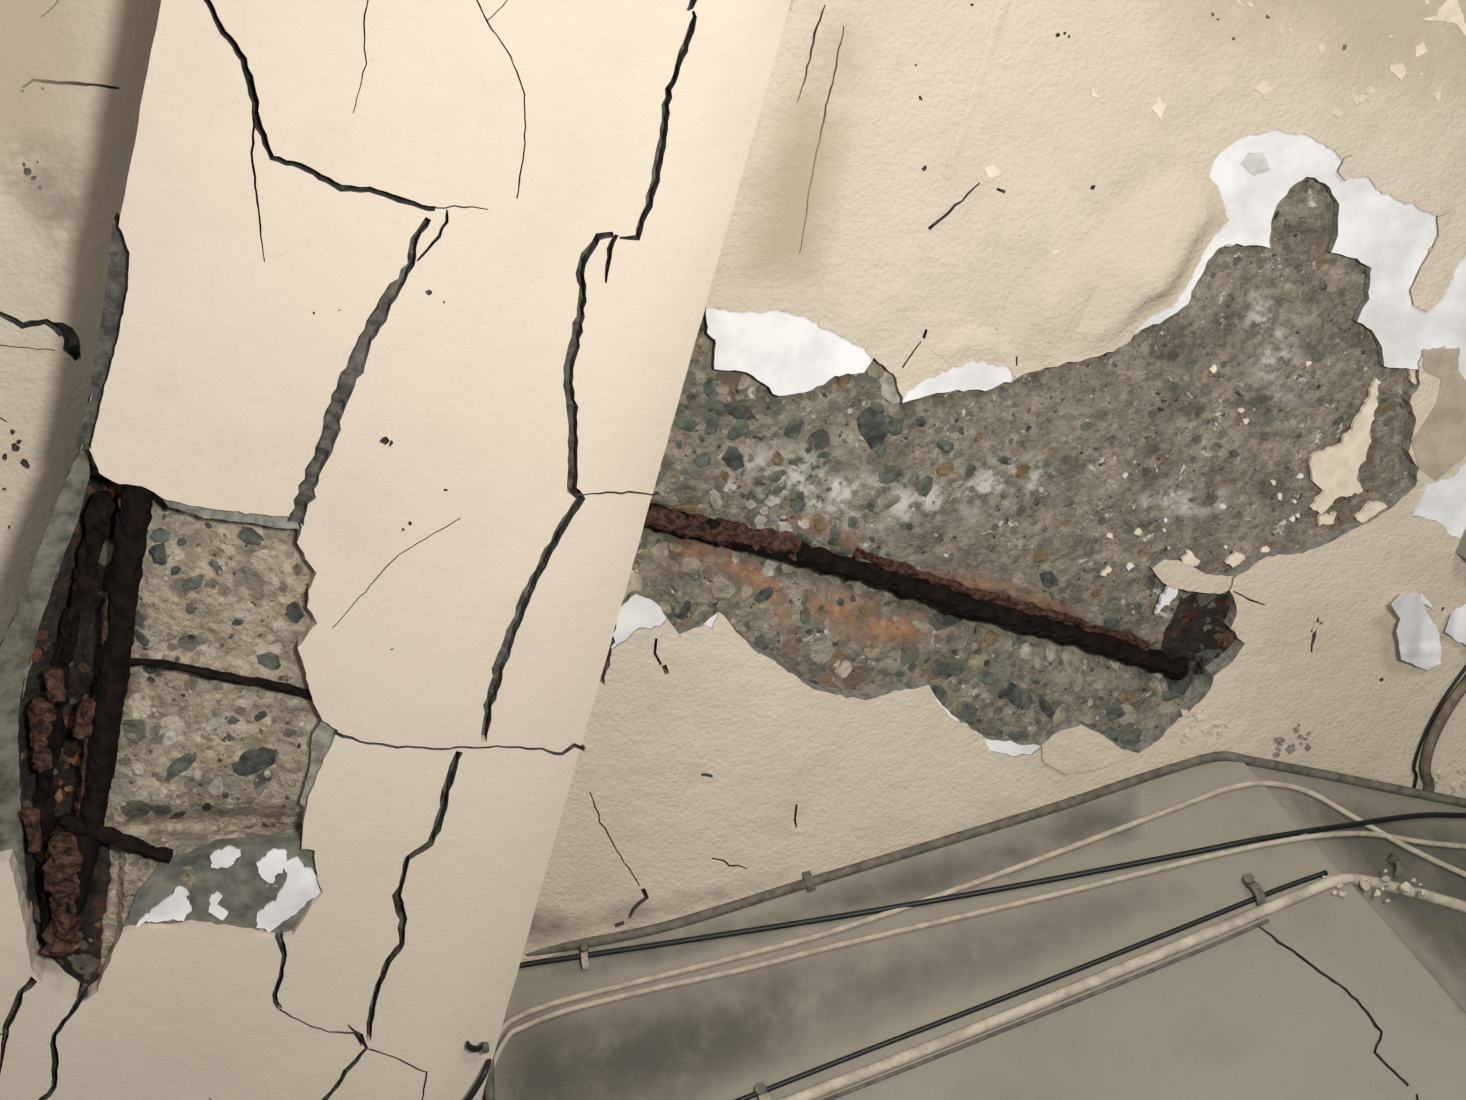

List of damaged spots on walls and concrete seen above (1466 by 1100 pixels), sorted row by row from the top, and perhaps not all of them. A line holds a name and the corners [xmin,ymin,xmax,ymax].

crack [204,0,526,526]
crack [0,311,81,360]
spalling [601,129,1466,774]
spalling [0,213,336,992]
crack [272,0,697,1100]
rust [687,546,785,620]
rust [813,595,918,640]
rust [941,575,1064,612]
rust [55,746,80,809]
crack [0,976,37,1073]
crack [38,983,88,1100]
crack [1259,926,1419,1100]